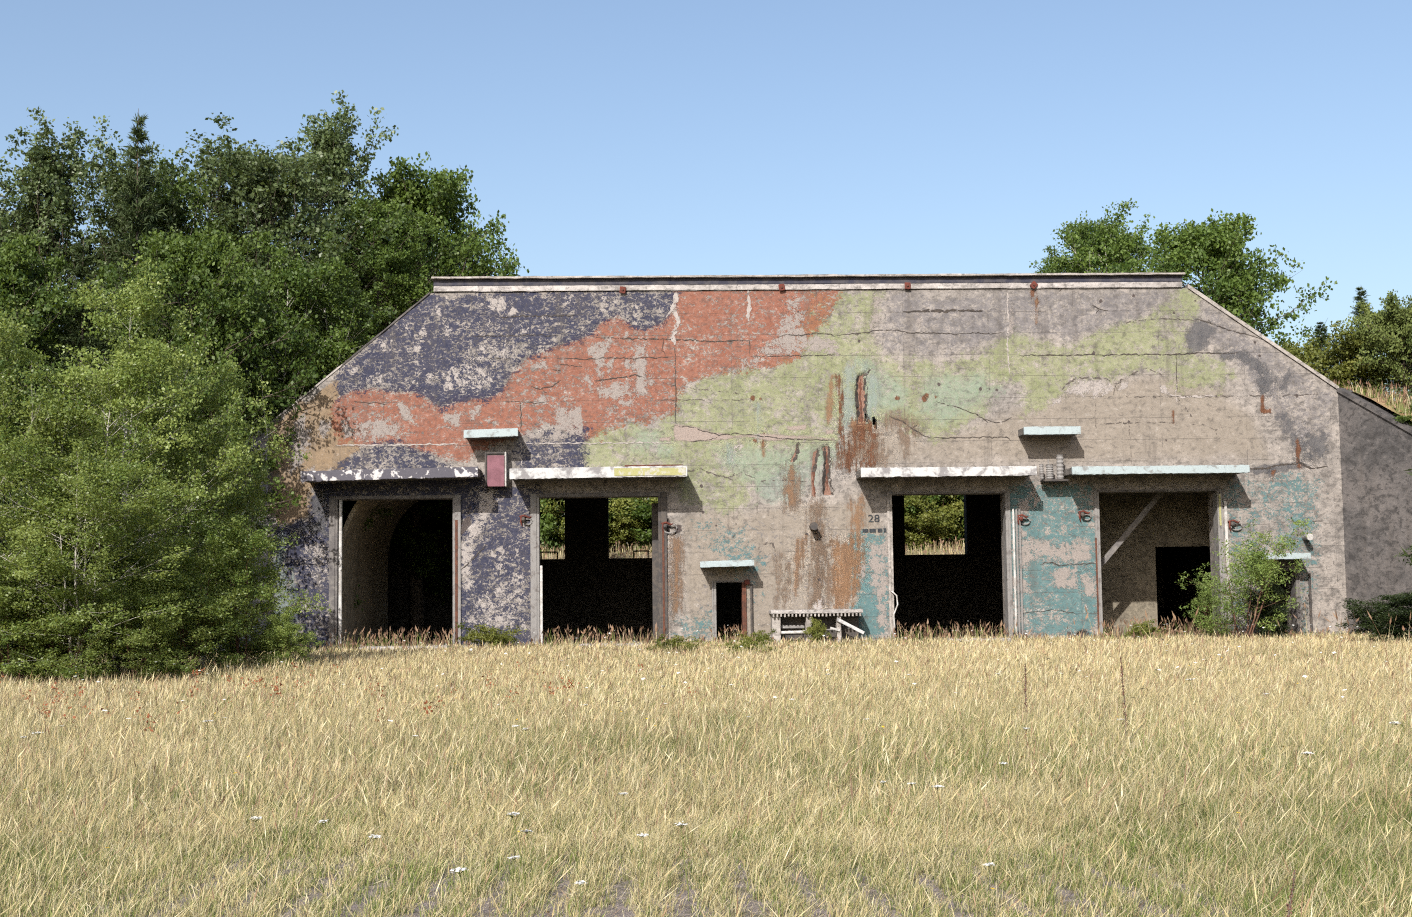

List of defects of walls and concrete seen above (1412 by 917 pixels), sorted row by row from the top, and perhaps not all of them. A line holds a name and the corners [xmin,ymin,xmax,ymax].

peeling [461,486,528,636]
peeling [524,391,586,443]
peeling [581,331,656,407]
rust [776,375,888,609]
crack [471,305,1328,509]
peeling [1012,479,1097,639]